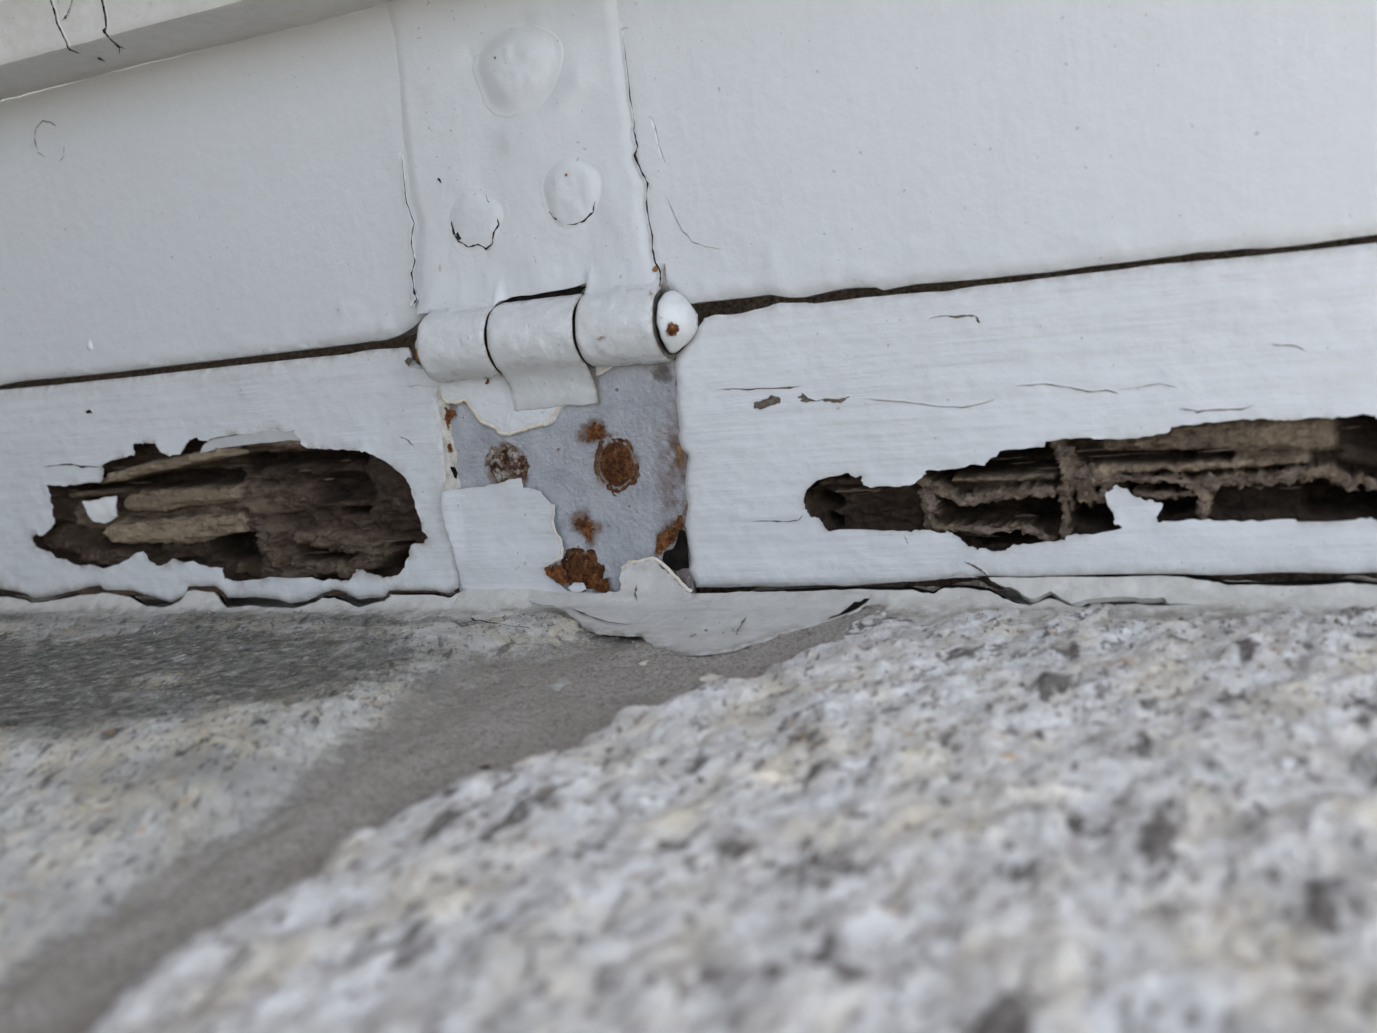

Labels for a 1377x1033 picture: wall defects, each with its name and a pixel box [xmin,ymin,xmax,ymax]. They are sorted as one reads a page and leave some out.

crack [50,0,128,62]
crack [618,24,721,286]
rust [444,401,465,452]
rust [579,420,638,487]
rust [671,439,683,468]
peeling [82,496,118,524]
rust [544,512,612,593]
peeling [404,357,871,665]
rust [654,515,685,555]